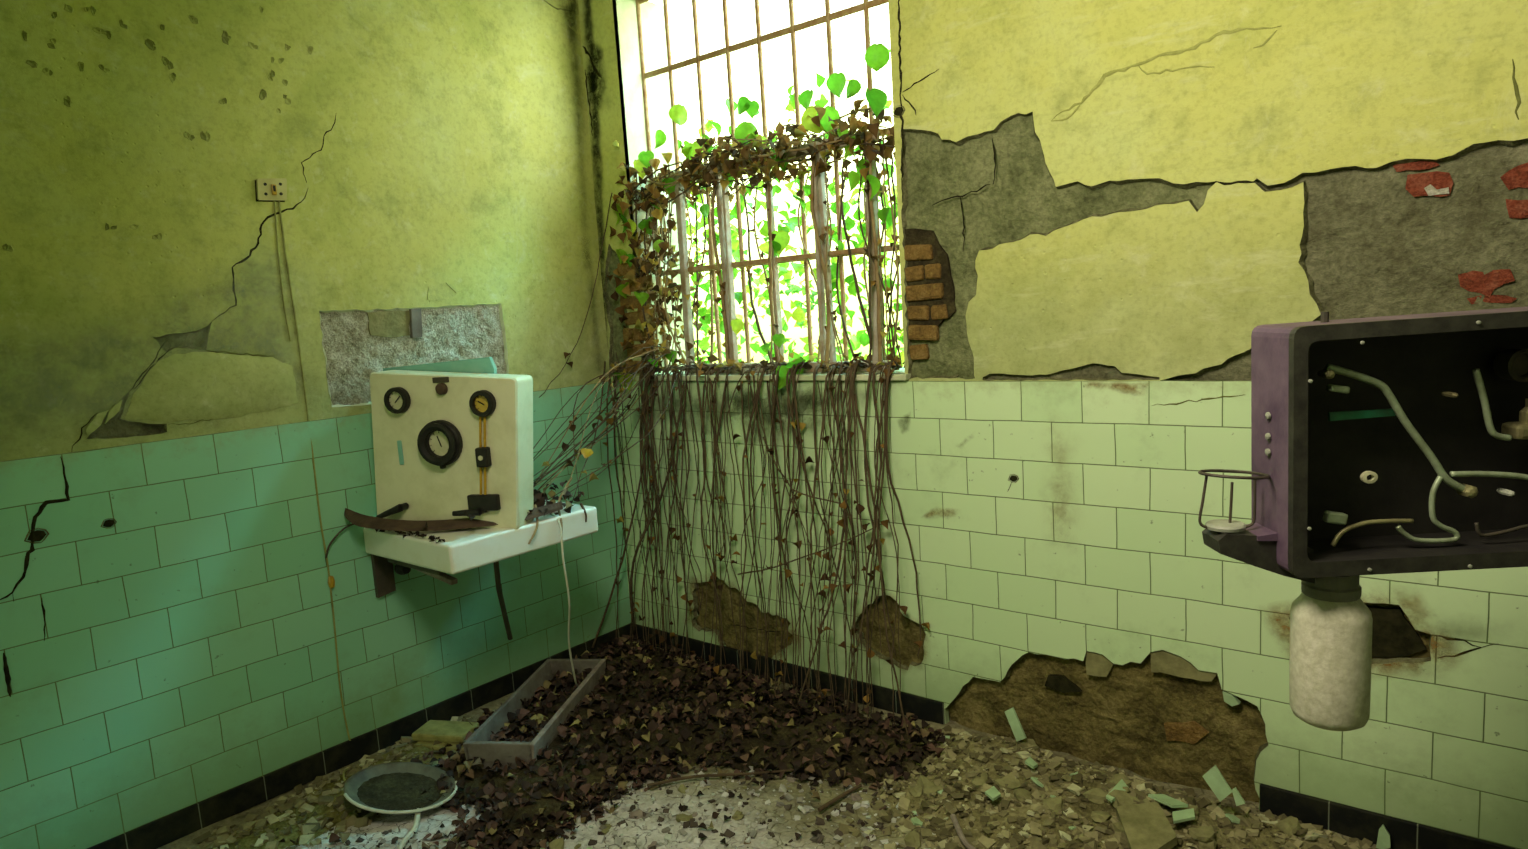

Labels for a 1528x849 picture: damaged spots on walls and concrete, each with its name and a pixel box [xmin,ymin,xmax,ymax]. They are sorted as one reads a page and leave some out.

crack [544,0,601,136]
crack [1051,26,1280,121]
water stain [568,0,606,324]
flaking render [892,105,1251,381]
flaking render [1253,138,1528,321]
crack [0,116,336,641]
flaking render [319,282,509,407]
crack [3,653,12,697]
peeling [688,577,798,658]
peeling [855,595,926,670]
peeling [946,650,1268,803]
peeling [1364,602,1445,669]